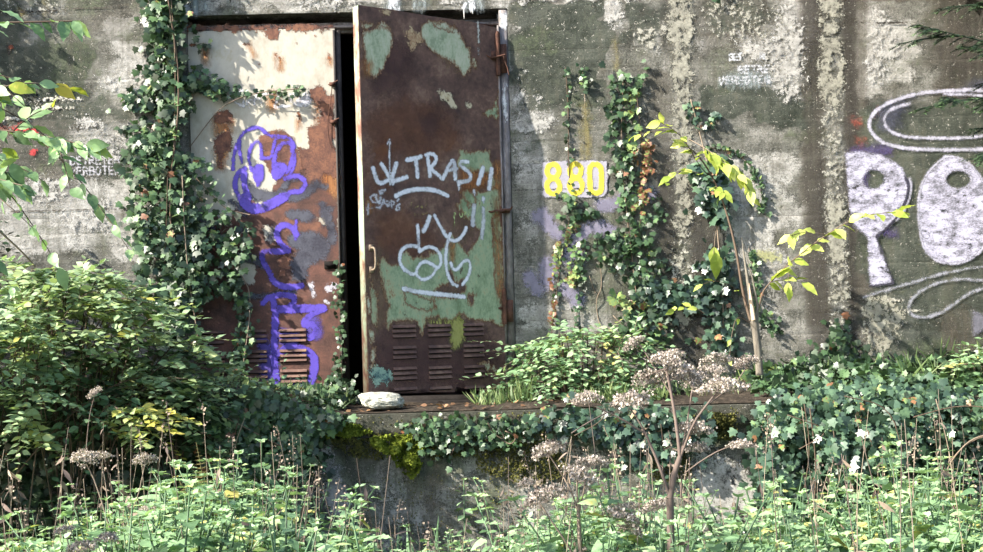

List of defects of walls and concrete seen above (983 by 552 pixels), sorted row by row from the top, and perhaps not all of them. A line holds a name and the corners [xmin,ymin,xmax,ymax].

corrosion [185,23,333,65]
corrosion [366,41,412,96]
corrosion [191,84,346,387]
corrosion [460,163,502,296]
corrosion [370,256,496,387]